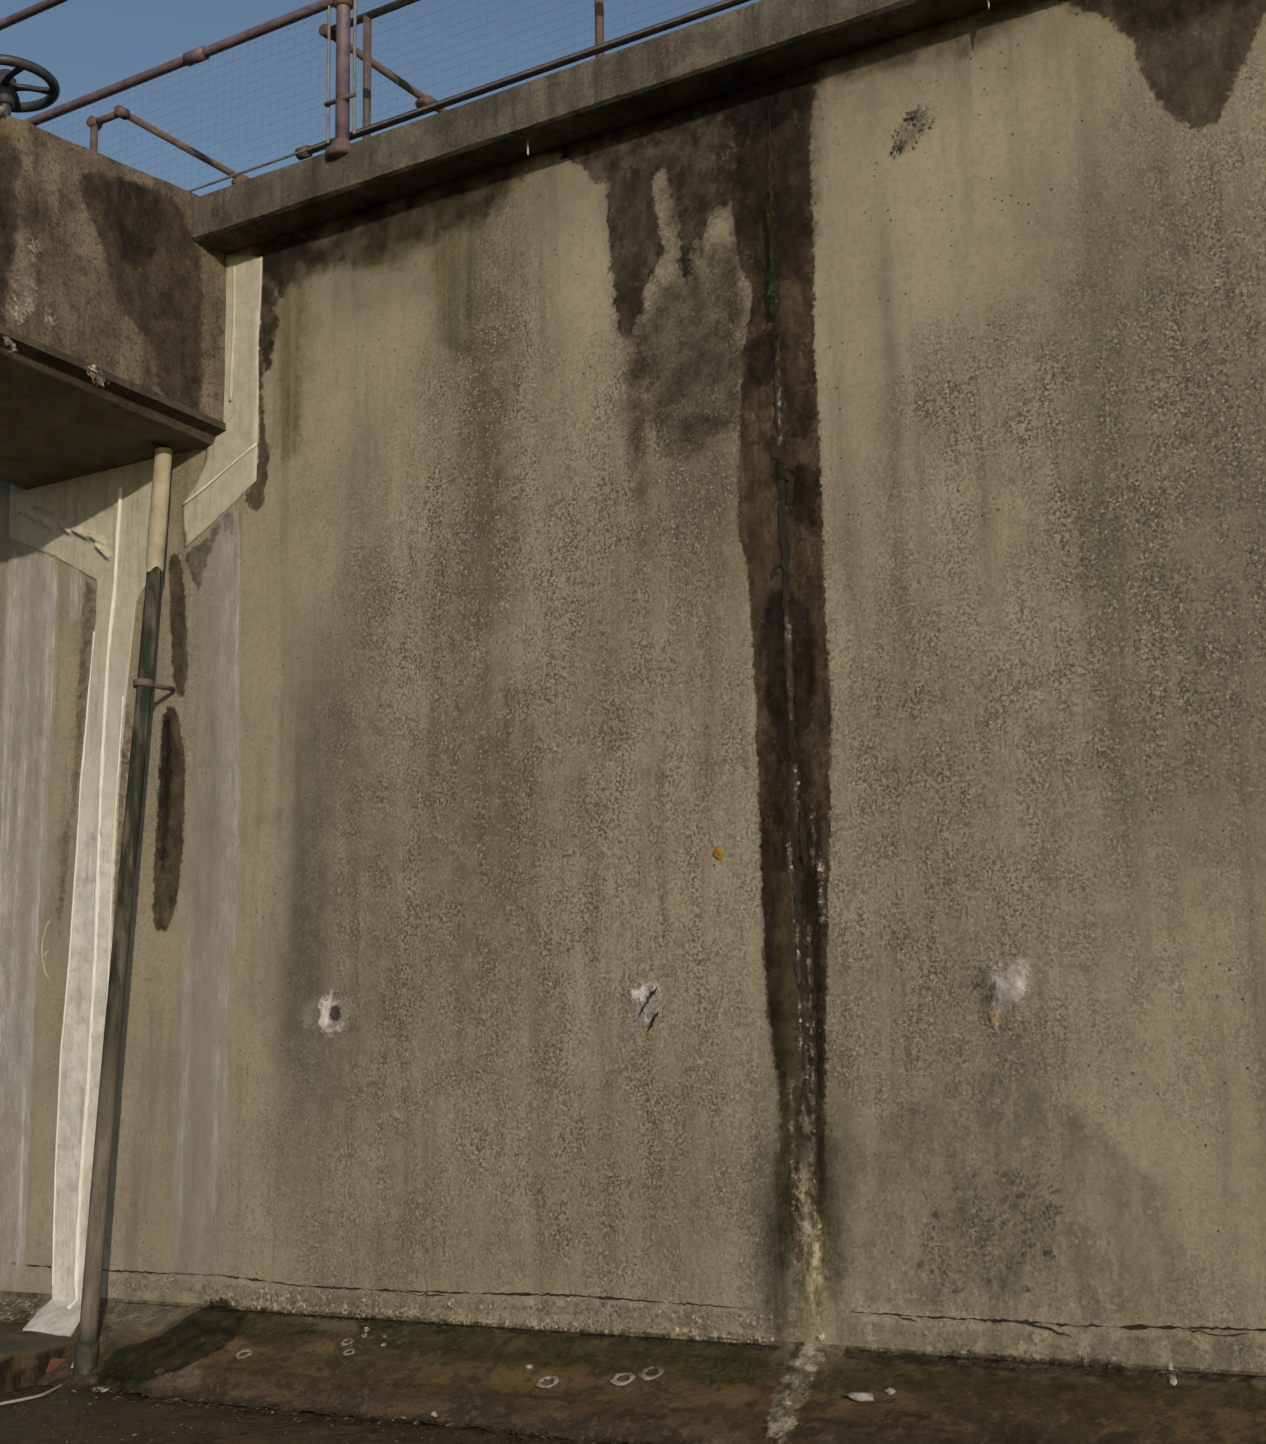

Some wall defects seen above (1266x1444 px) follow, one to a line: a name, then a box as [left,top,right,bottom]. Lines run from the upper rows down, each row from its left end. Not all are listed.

damp [1048,0,1266,128]
damp [81,170,205,411]
damp [237,0,1028,1443]
damp [152,512,240,1212]
spalling [319,990,351,1038]
spalling [631,982,661,1036]
spalling [974,960,1030,1027]
crack [842,1311,1266,1337]